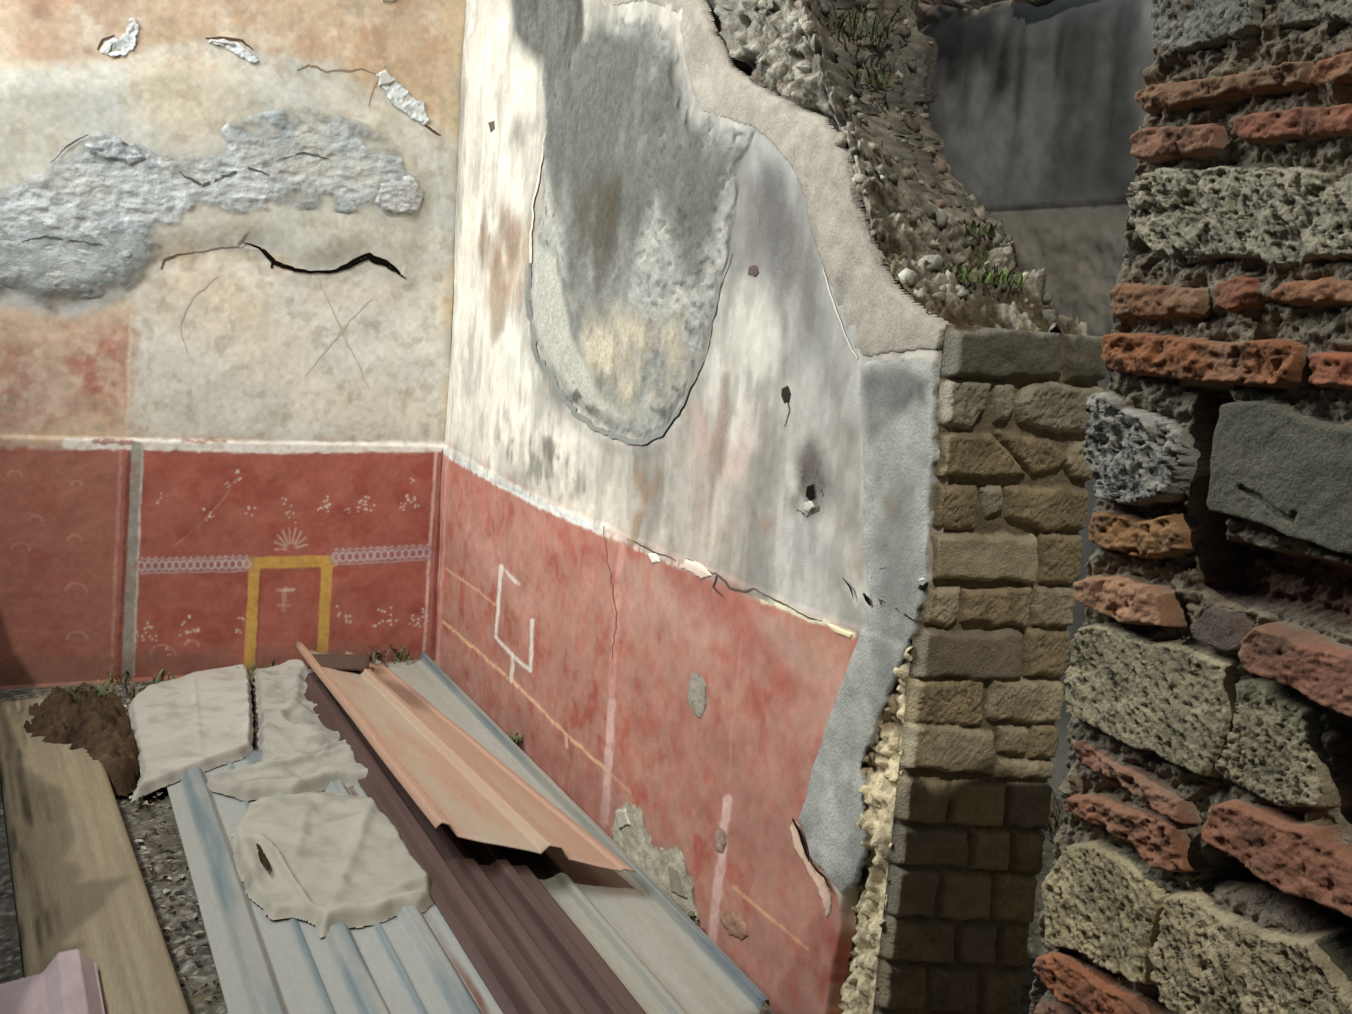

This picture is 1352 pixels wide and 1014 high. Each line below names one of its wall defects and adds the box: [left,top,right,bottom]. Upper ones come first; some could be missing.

spalling [0,109,425,299]
crack [161,242,407,391]
spalling [516,0,756,445]
spalling [748,265,760,277]
crack [603,526,853,654]
crack [843,567,930,621]
spalling [612,802,699,923]
spalling [790,819,832,917]